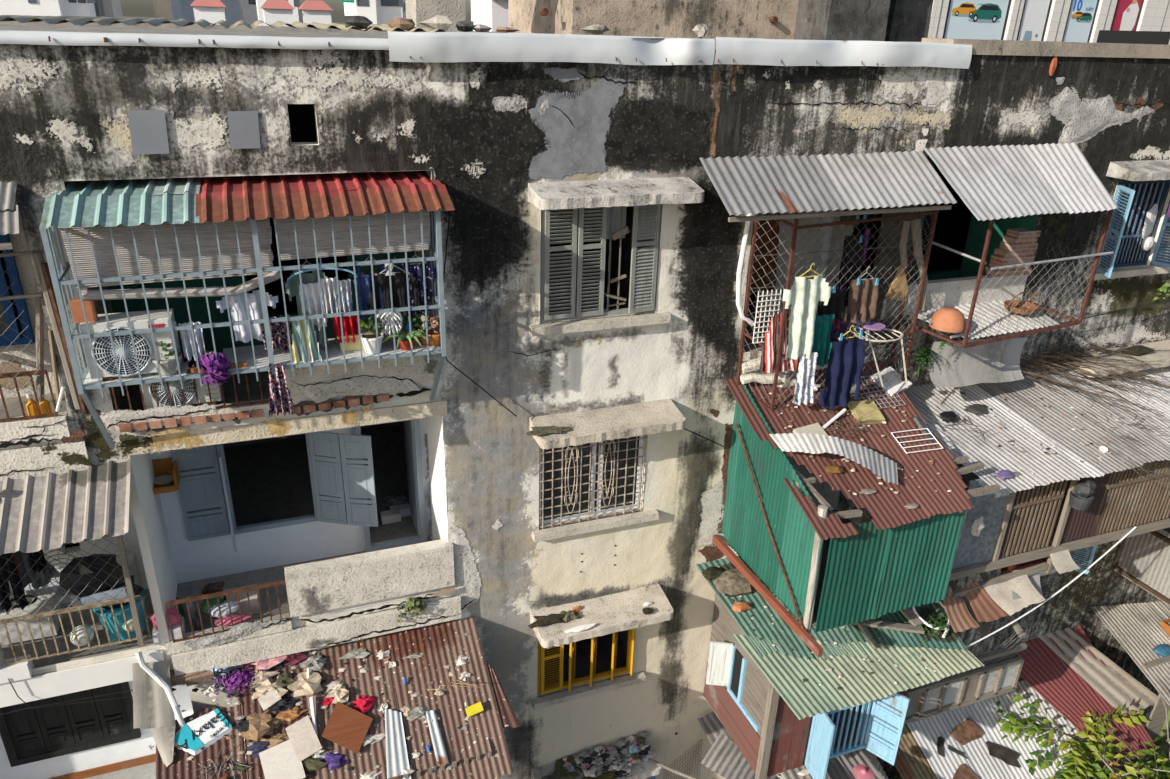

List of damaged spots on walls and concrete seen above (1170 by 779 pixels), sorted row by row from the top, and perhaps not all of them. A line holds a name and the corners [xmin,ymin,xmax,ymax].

water stain [427,67,580,297]
water stain [603,96,709,173]
spalling [999,77,1164,144]
peeling [1130,145,1170,161]
water stain [674,180,750,355]
crack [0,419,79,476]
crack [101,408,215,437]
water stain [660,438,719,649]
water stain [660,662,681,704]